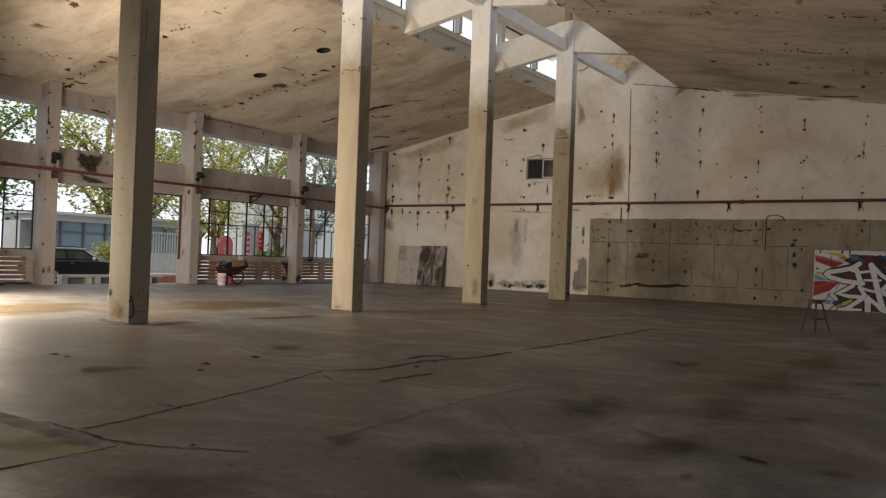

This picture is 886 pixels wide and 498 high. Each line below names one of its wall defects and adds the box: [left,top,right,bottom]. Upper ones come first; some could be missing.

water stain [488,277,545,289]
crack [406,355,452,368]
crack [42,421,248,452]